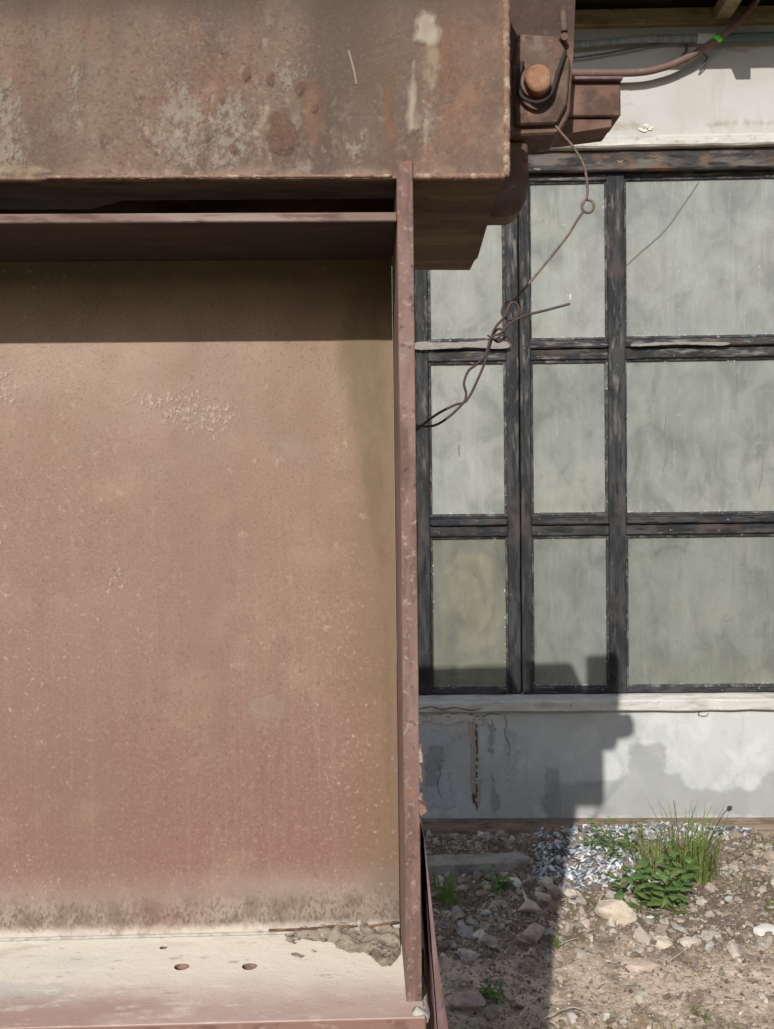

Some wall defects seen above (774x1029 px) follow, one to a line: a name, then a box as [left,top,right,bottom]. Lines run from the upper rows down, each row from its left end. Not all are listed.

peeling [415,13,439,88]
peeling [153,83,252,169]
flaking render [419,706,501,816]
peeling [285,933,354,957]